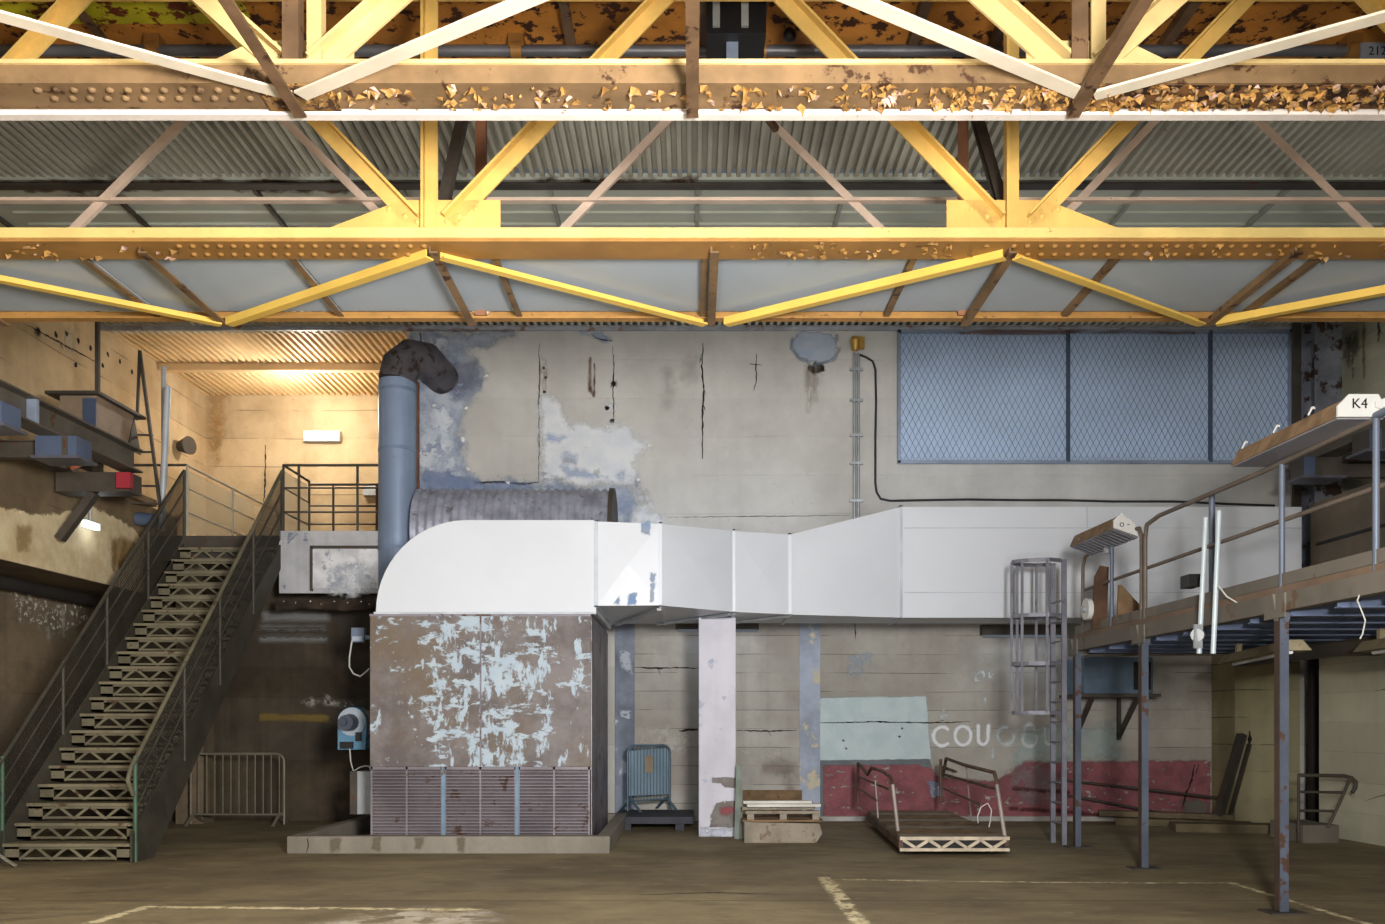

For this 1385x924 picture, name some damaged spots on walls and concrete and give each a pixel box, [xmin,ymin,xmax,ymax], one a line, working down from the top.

flaking render [410,331,665,534]
crack [699,343,707,459]